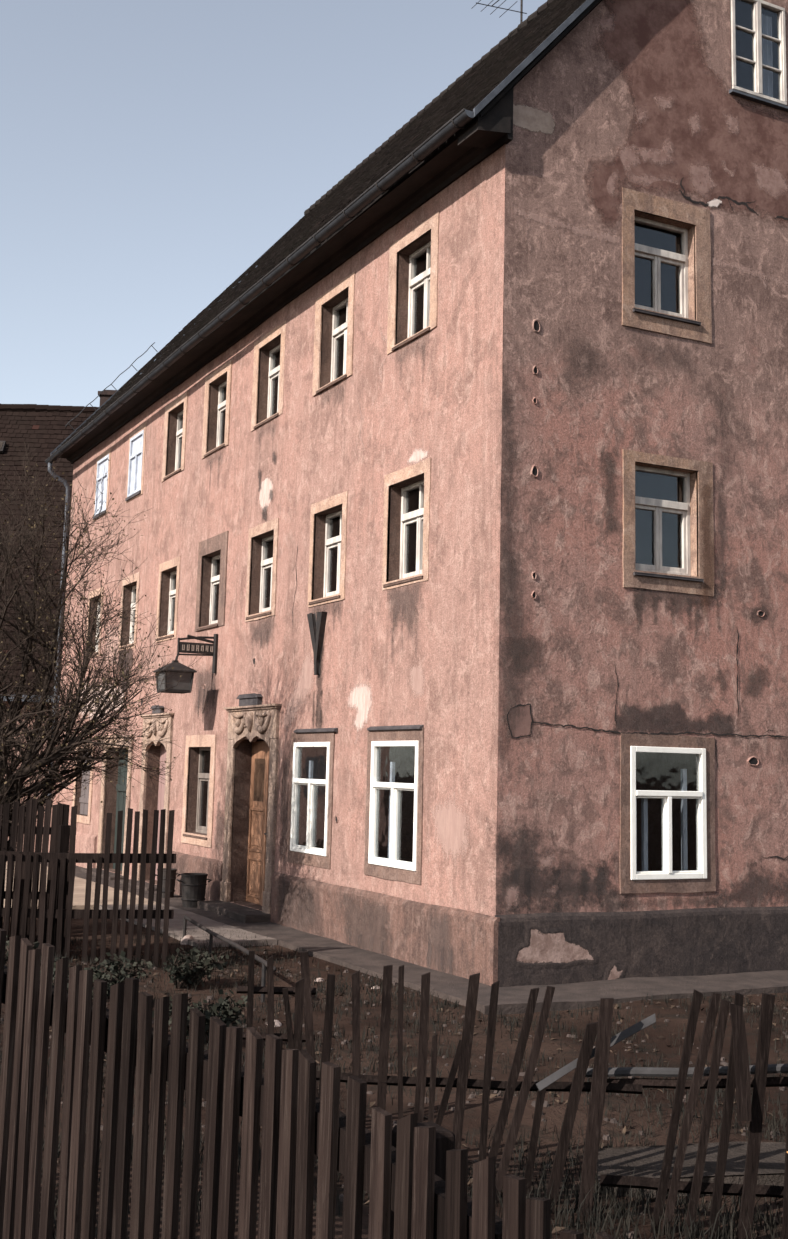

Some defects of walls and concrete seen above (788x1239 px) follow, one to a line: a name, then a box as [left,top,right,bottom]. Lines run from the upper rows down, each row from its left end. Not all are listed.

crack [680,177,788,220]
peeling [348,669,372,744]
crack [507,628,788,768]
damp [613,704,732,735]
spalling [511,919,627,980]